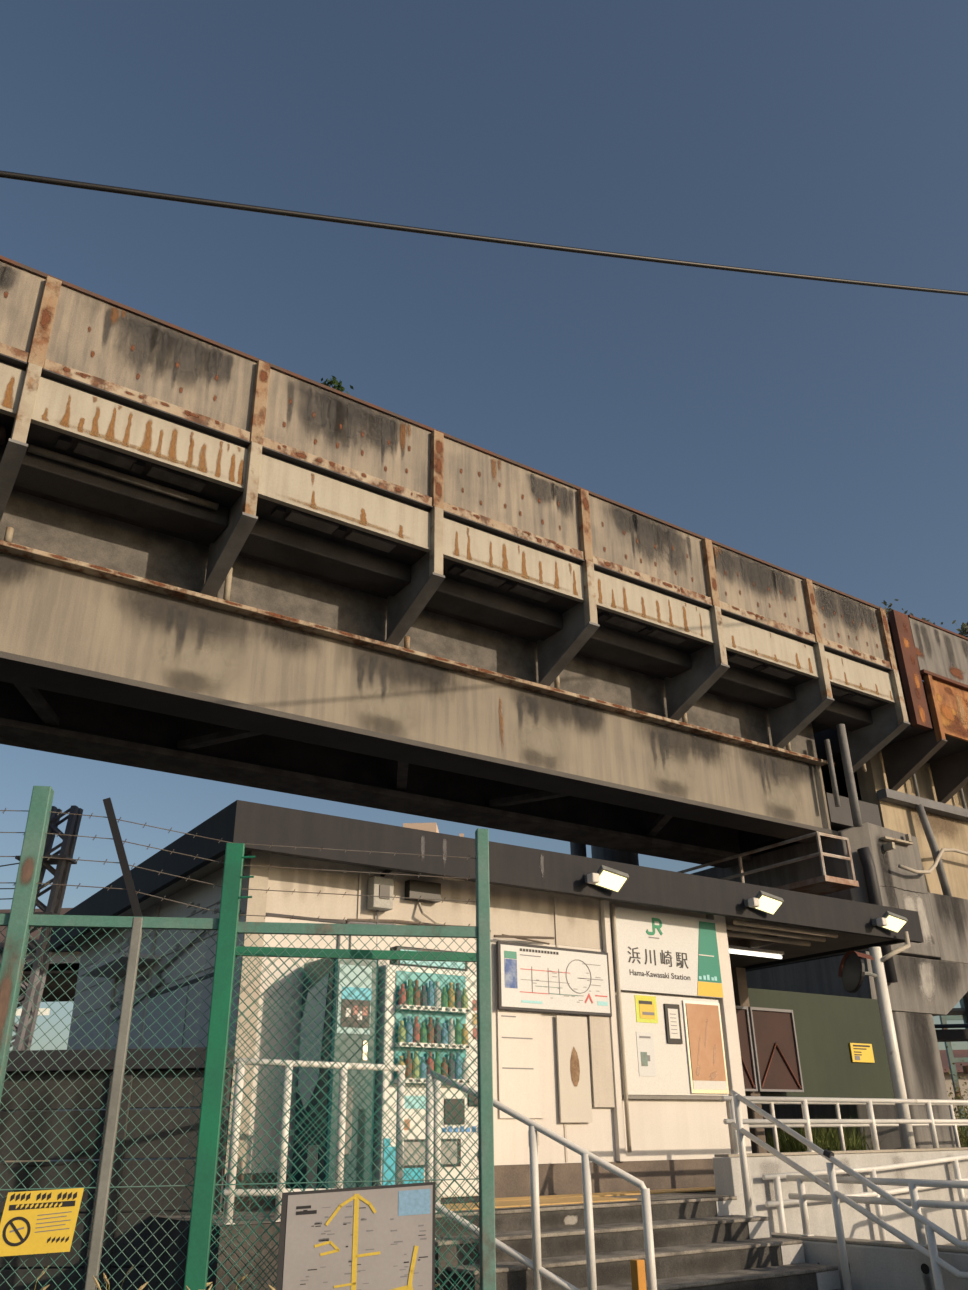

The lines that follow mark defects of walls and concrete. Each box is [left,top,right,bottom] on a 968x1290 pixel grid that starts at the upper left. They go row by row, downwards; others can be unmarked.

leakage [103,310,233,382]
corrosion [3,378,15,409]
corrosion [42,374,244,485]
leakage [287,383,404,455]
leakage [530,474,573,513]
leakage [612,504,691,566]
leakage [129,586,246,682]
corrosion [598,545,893,700]
leakage [713,548,794,597]
leakage [813,587,877,630]
leakage [354,645,448,723]
leakage [517,688,602,759]